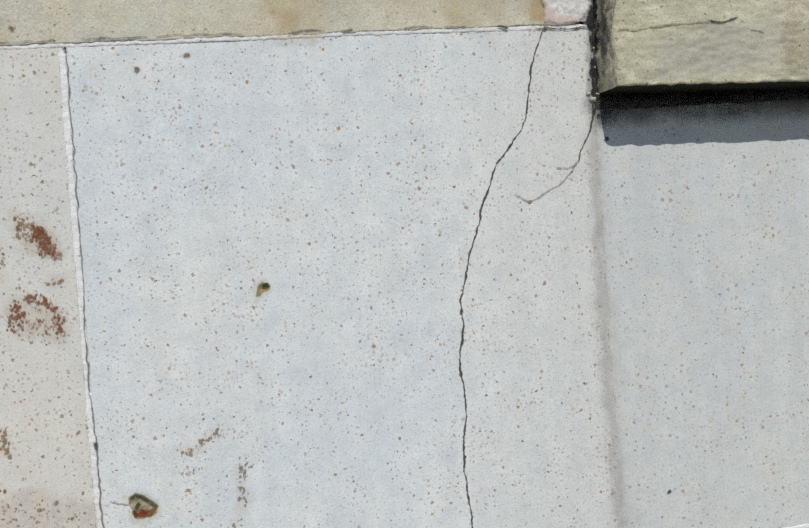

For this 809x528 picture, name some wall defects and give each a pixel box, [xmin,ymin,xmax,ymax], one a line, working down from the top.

crack [87,32,243,40]
crack [404,23,466,31]
corrosion [13,216,62,260]
crack [459,26,595,528]
corrosion [6,286,65,343]